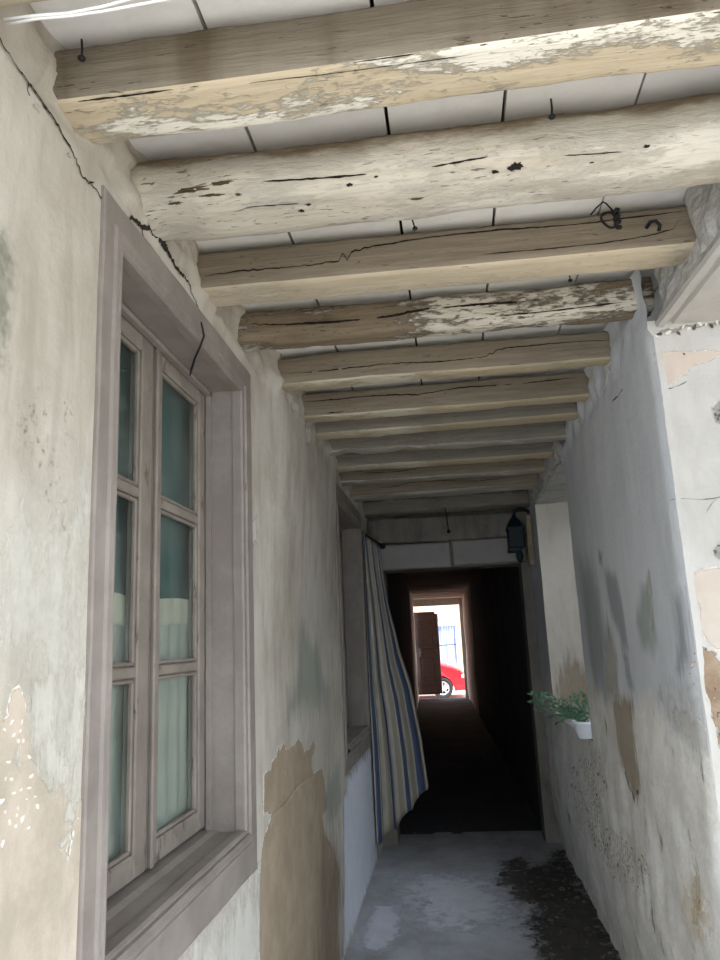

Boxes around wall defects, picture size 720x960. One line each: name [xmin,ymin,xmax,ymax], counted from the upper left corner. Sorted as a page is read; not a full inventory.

crack [0,38,102,199]
crack [124,211,198,306]
peeling [689,545,720,744]
flaking render [0,685,81,960]
flaking render [260,737,340,960]